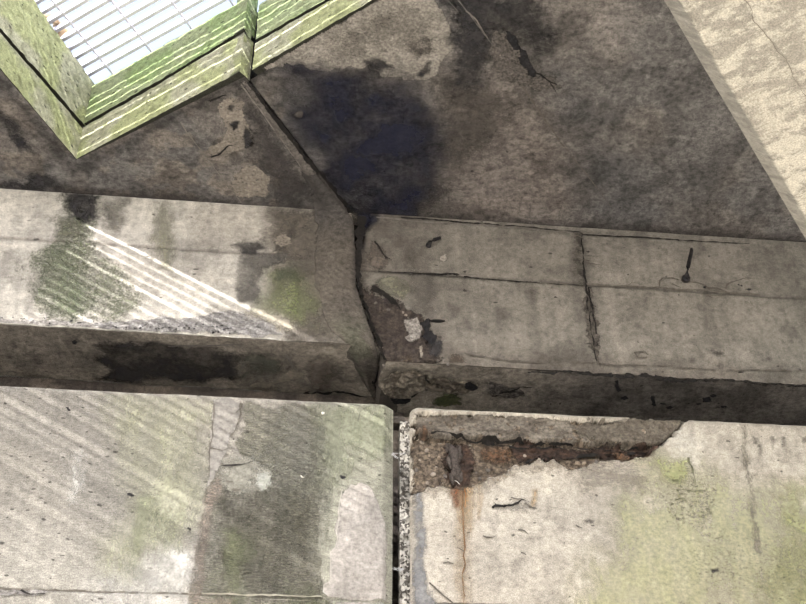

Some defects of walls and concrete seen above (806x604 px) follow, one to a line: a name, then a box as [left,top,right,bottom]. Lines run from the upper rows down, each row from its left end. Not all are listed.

damp [287,63,511,216]
damp [99,200,130,231]
damp [40,217,100,318]
damp [95,341,304,389]
spalling [358,233,806,404]
spalling [410,414,684,502]